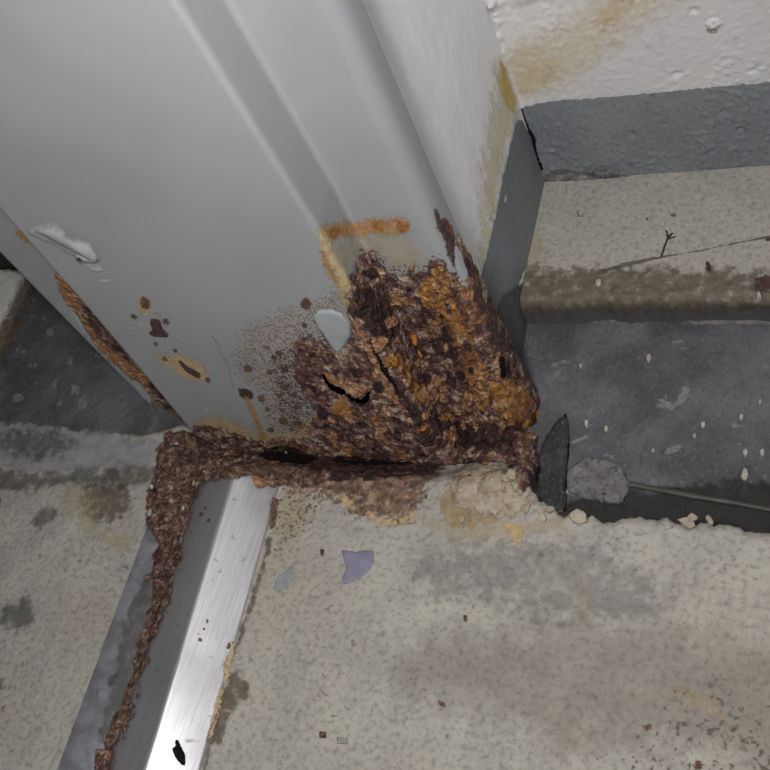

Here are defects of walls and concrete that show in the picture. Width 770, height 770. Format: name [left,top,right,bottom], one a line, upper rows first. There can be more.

corrosion [55,273,183,421]
corrosion [131,296,210,383]
corrosion [192,209,540,558]
spalling [446,414,587,524]
spalling [677,513,714,529]